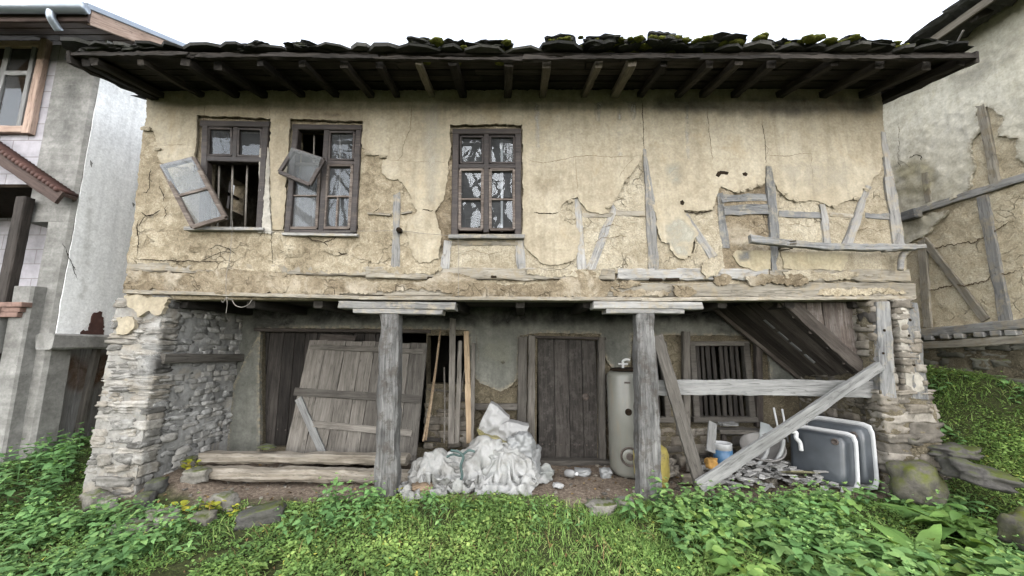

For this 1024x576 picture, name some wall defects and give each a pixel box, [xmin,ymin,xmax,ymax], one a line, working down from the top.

crack [136,169,234,262]
flaking render [126,107,1024,329]
crack [935,219,1018,249]
crack [931,270,1020,290]
flaking render [80,311,105,335]
flaking render [470,369,518,403]